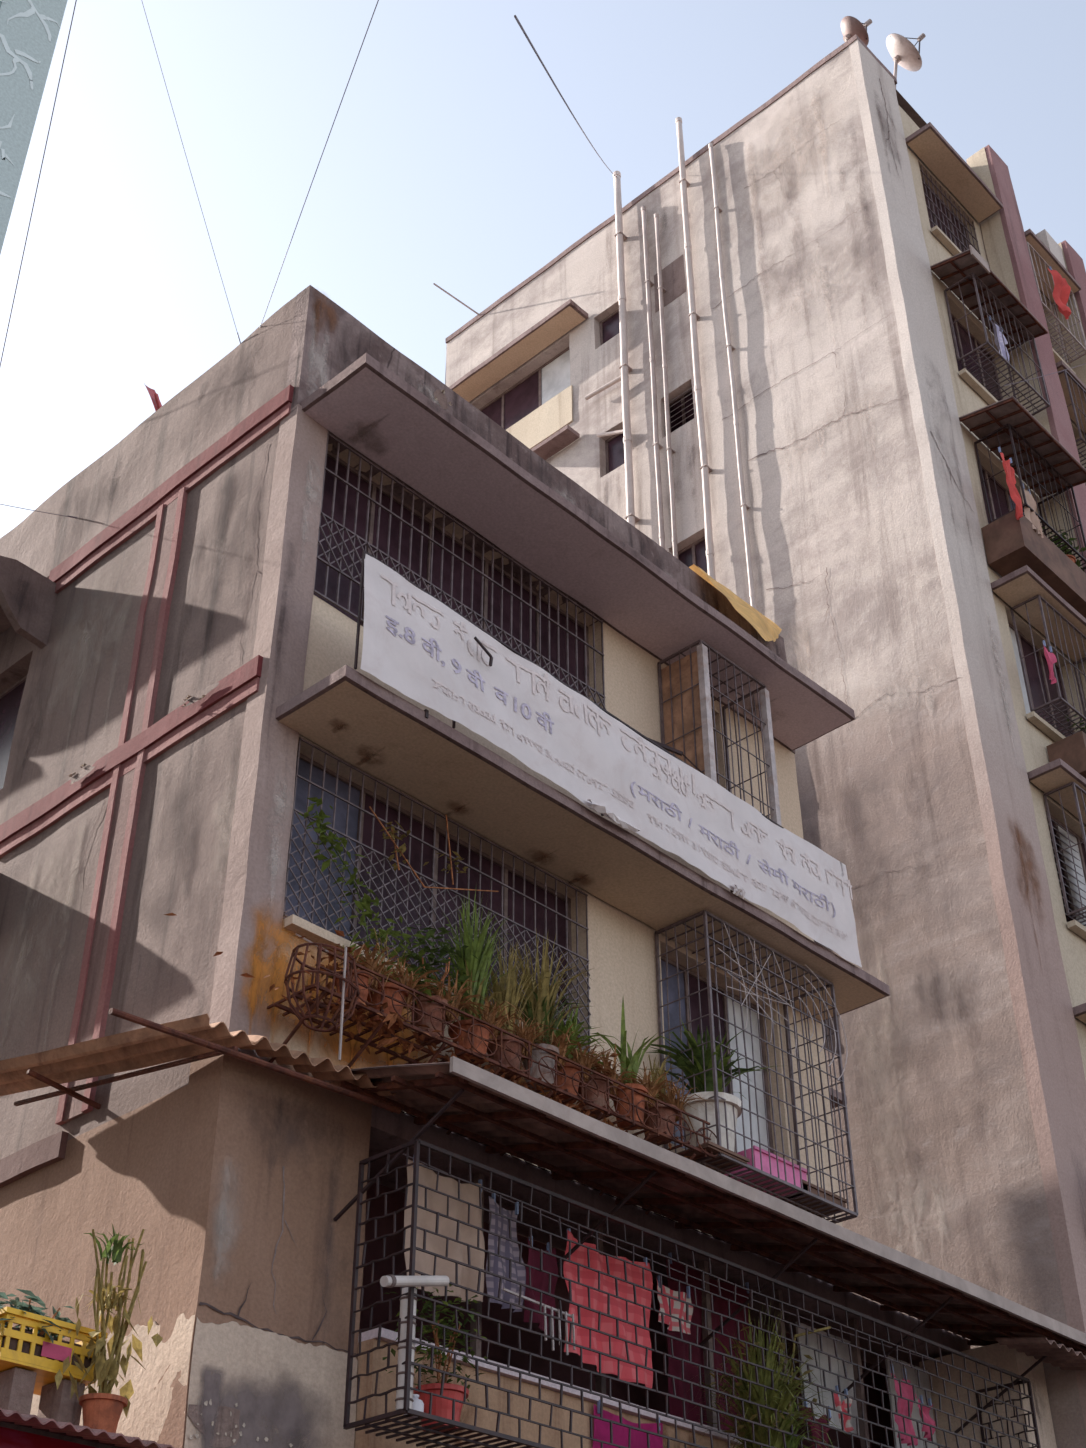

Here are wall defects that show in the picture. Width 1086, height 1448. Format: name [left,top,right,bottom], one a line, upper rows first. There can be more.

crack [0,0,61,198]
corrosion [246,920,424,1069]
crack [200,1166,356,1354]